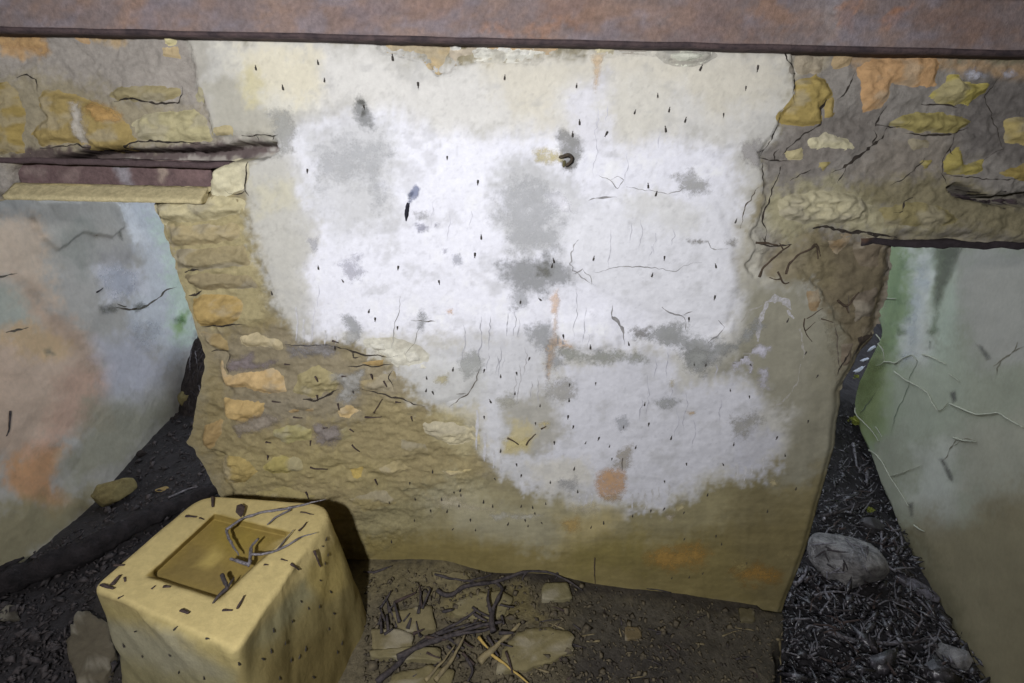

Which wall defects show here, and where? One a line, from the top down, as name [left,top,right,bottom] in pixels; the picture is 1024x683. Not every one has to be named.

damp [355,100,372,128]
damp [537,131,581,168]
damp [677,174,707,192]
crack [740,73,1018,247]
flaking render [748,54,1024,393]
crack [116,269,201,310]
flaking render [0,36,501,560]
crack [611,306,625,345]
damp [496,186,770,445]
damp [935,248,959,301]
crack [285,299,432,406]
rust [597,470,624,500]